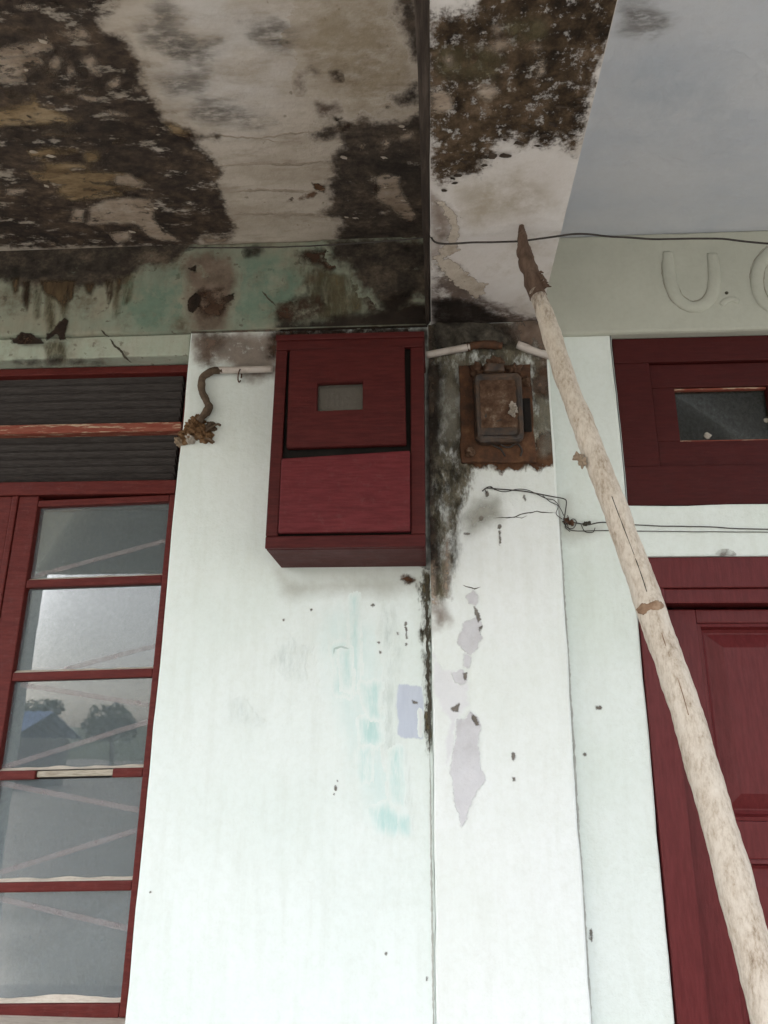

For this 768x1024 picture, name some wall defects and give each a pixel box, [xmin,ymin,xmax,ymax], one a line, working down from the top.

water stain [0,0,768,388]
spalling [10,318,68,344]
crack [101,330,130,362]
corrosion [469,355,549,428]
water stain [332,323,551,638]
corrosion [469,431,553,473]
peeling [395,589,486,828]